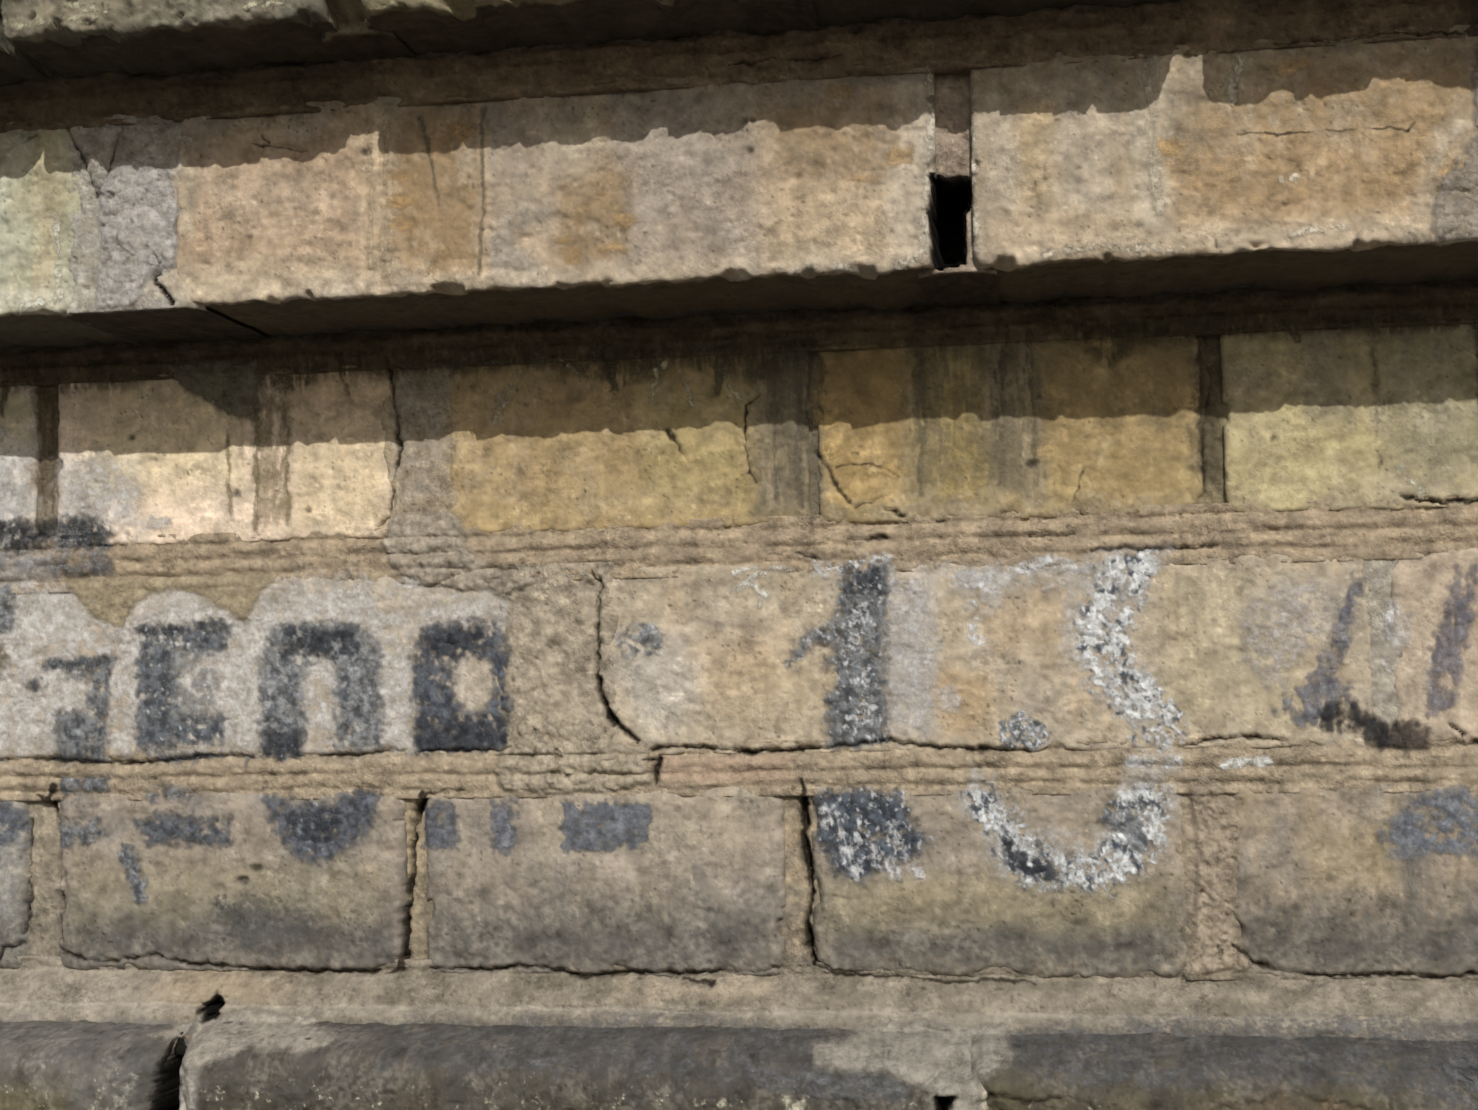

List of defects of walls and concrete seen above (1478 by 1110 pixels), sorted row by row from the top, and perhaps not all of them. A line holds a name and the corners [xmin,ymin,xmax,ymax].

crack [67,128,115,198]
crack [154,271,175,305]
crack [1401,496,1478,505]
crack [0,569,1036,987]